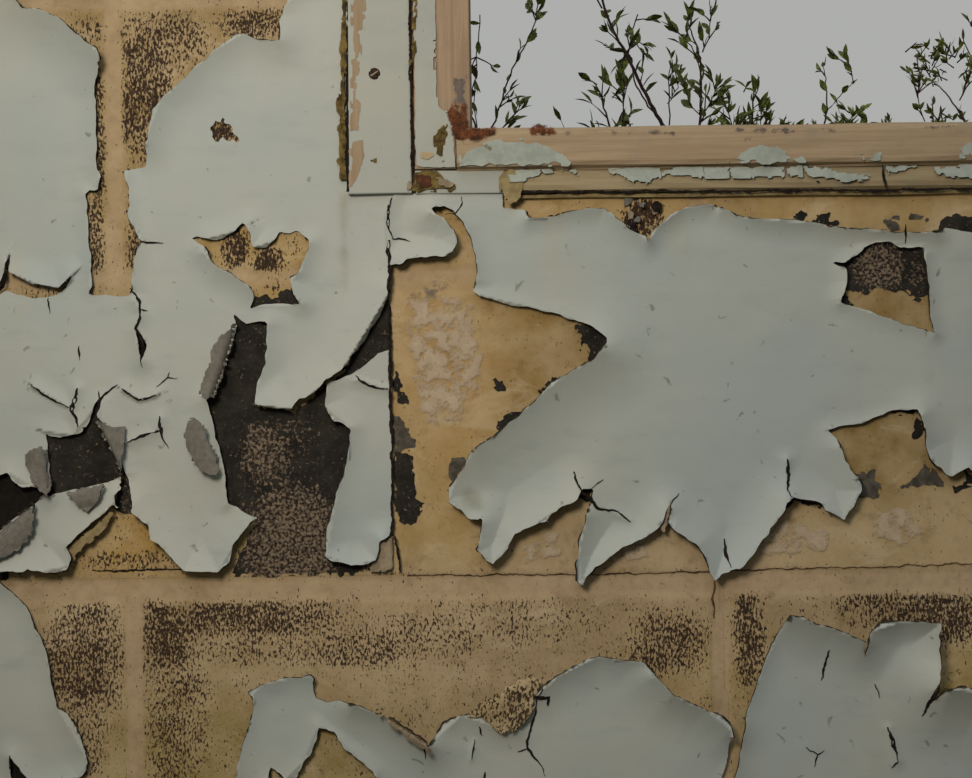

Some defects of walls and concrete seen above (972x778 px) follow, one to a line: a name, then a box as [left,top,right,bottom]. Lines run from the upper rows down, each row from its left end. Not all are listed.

peeling [0,0,313,300]
peeling [420,124,448,162]
rust [448,104,494,140]
rust [530,124,554,135]
peeling [458,138,972,345]
crack [130,288,147,368]
crack [30,372,178,448]
crack [355,198,972,619]
peeling [0,170,972,778]
crack [518,689,550,776]